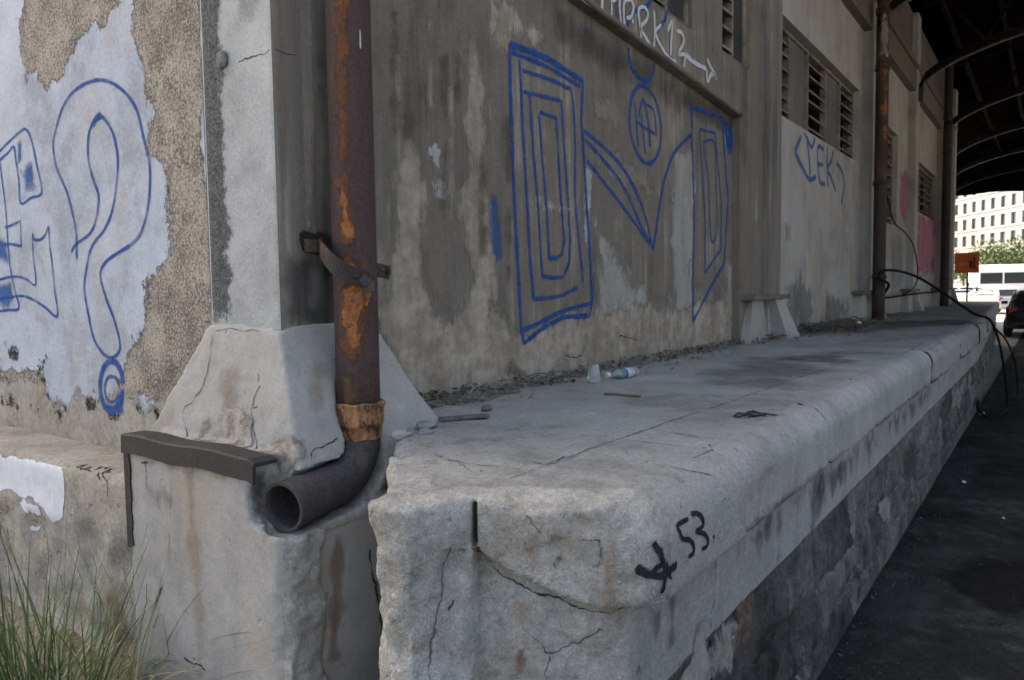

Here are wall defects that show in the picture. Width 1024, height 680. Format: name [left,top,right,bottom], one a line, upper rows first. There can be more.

crack [238,49,294,63]
rust [333,0,359,268]
rust [878,13,889,145]
peeling [0,0,212,451]
rust [337,282,371,363]
crack [182,328,259,437]
crack [251,373,260,450]
crack [435,368,827,479]
peeling [0,454,71,540]
crack [428,547,648,680]